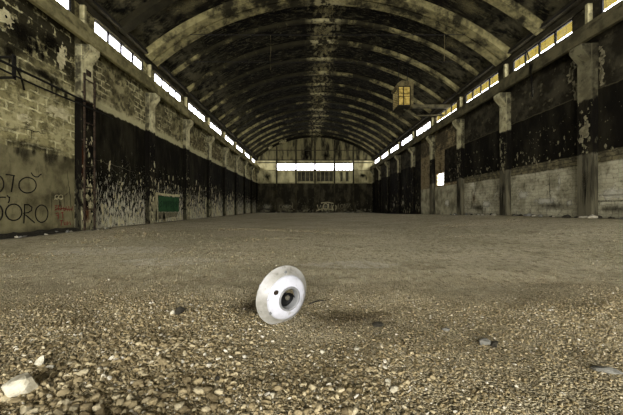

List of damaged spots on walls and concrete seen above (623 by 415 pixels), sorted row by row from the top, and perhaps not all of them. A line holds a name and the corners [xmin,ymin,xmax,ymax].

spalling [0,7,14,29]
spalling [57,42,67,70]
spalling [598,46,606,86]
spalling [46,105,72,121]